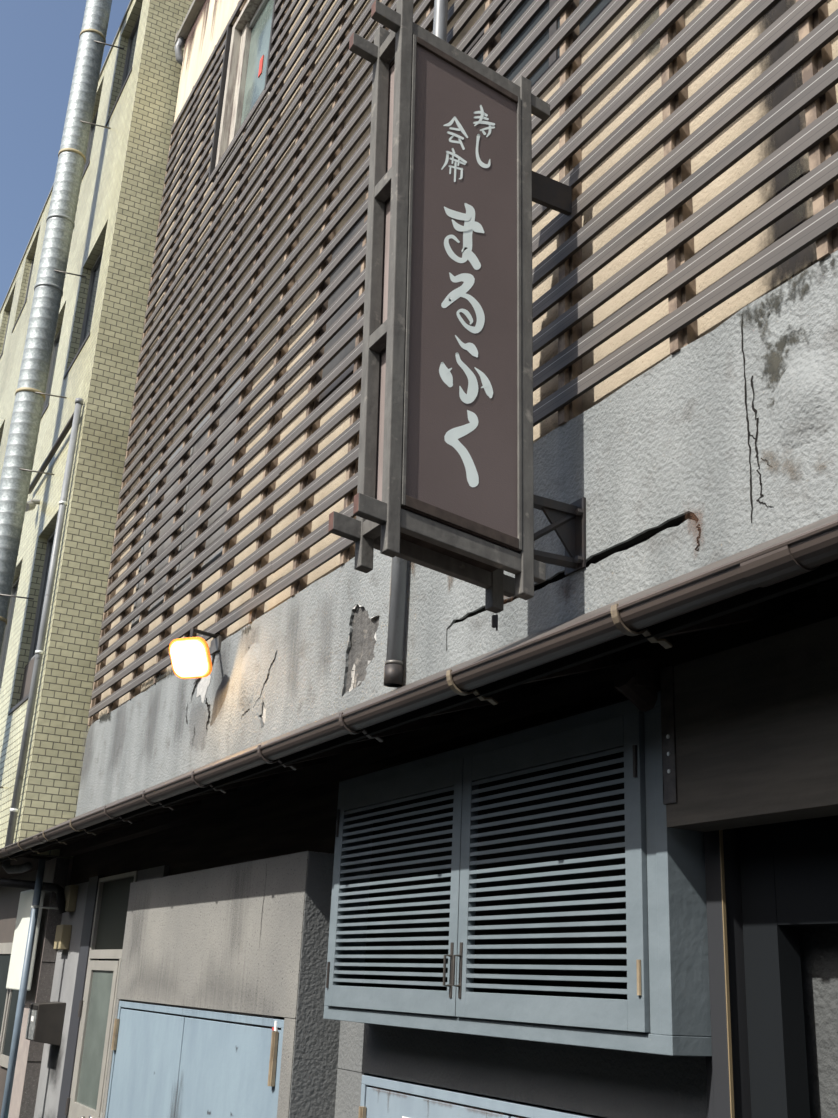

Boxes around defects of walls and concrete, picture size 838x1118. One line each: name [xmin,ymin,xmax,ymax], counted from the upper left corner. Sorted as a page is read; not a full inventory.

leakage [760,0,796,32]
leakage [760,27,799,70]
leakage [764,66,803,112]
leakage [765,109,806,158]
leakage [766,156,808,203]
leakage [768,199,812,243]
leakage [739,242,834,387]
crack [741,314,773,523]
crack [454,512,701,623]
flaking render [341,604,379,697]
flaking render [186,654,215,743]